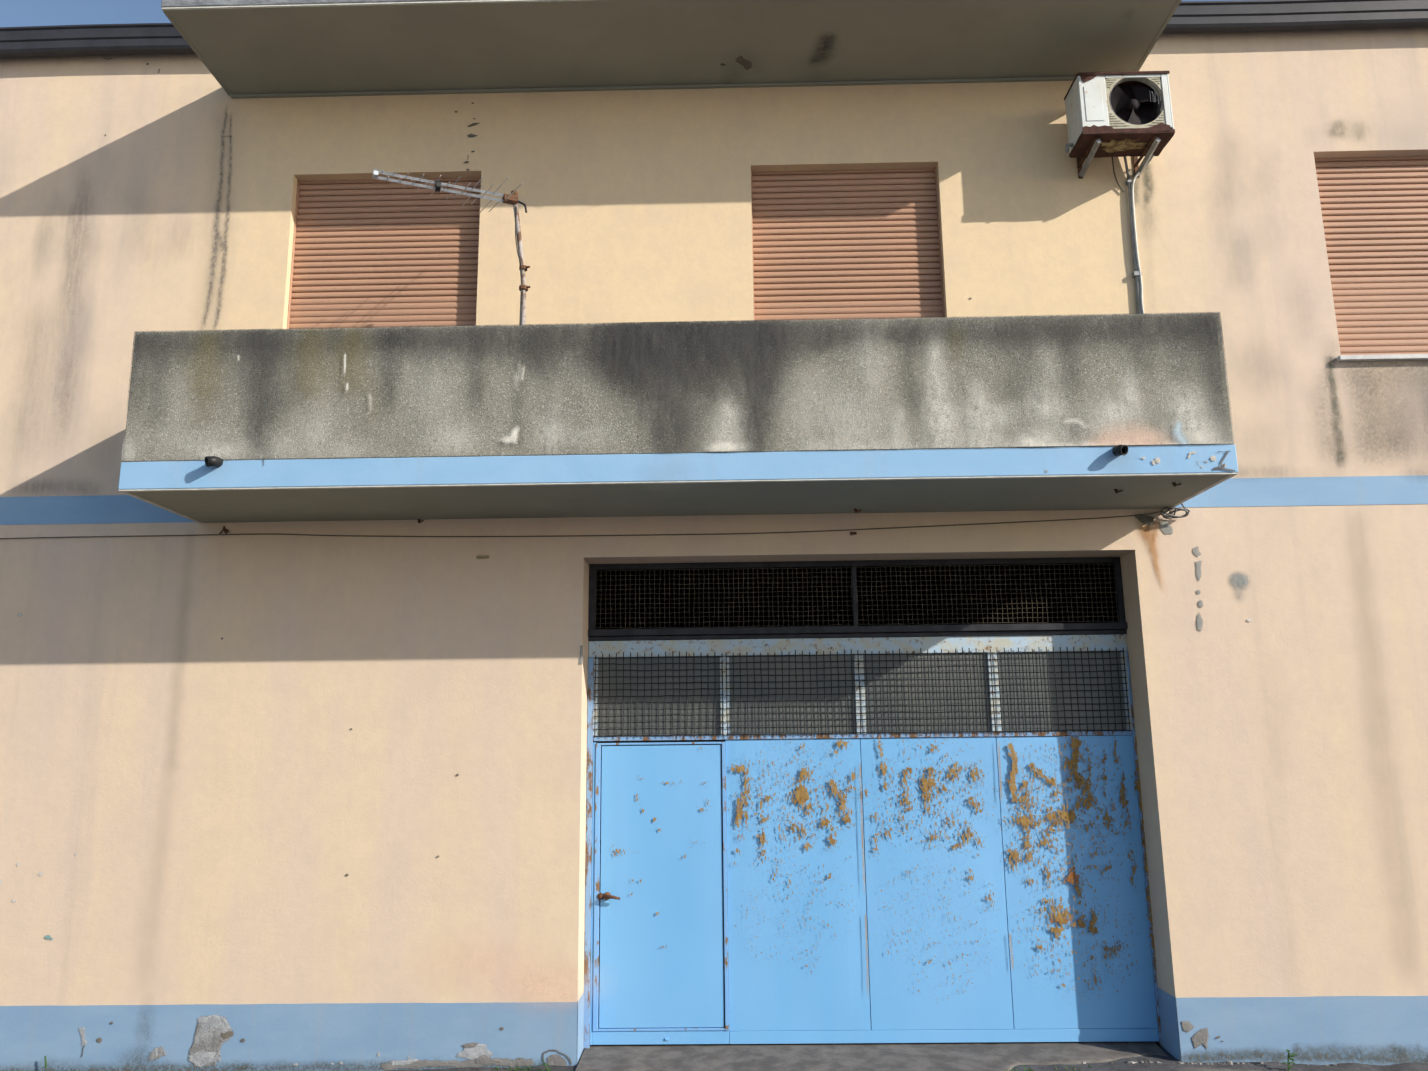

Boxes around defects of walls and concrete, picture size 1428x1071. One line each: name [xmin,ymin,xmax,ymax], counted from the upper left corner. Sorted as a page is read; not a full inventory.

damp [129,312,1227,452]
damp [1330,358,1344,461]
corrosion [728,728,1157,1002]
spalling [188,1014,245,1068]